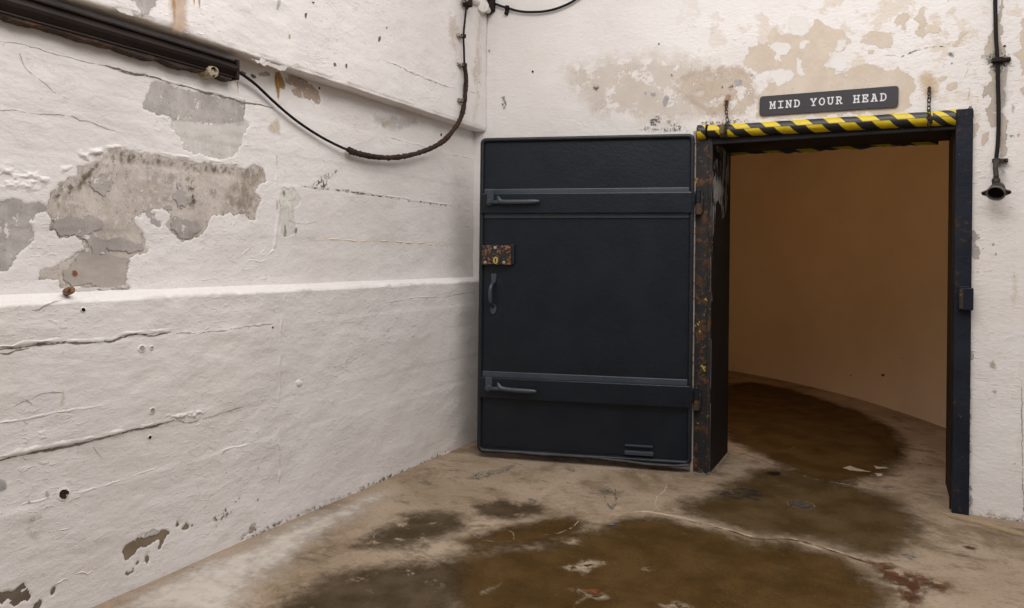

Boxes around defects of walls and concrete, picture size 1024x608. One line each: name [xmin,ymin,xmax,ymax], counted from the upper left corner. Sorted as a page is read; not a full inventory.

peeling [743,6,941,120]
peeling [968,0,1024,157]
peeling [0,81,266,291]
crack [0,324,271,355]
crack [0,391,241,461]
peeling [122,522,193,575]
leakage [281,382,920,608]